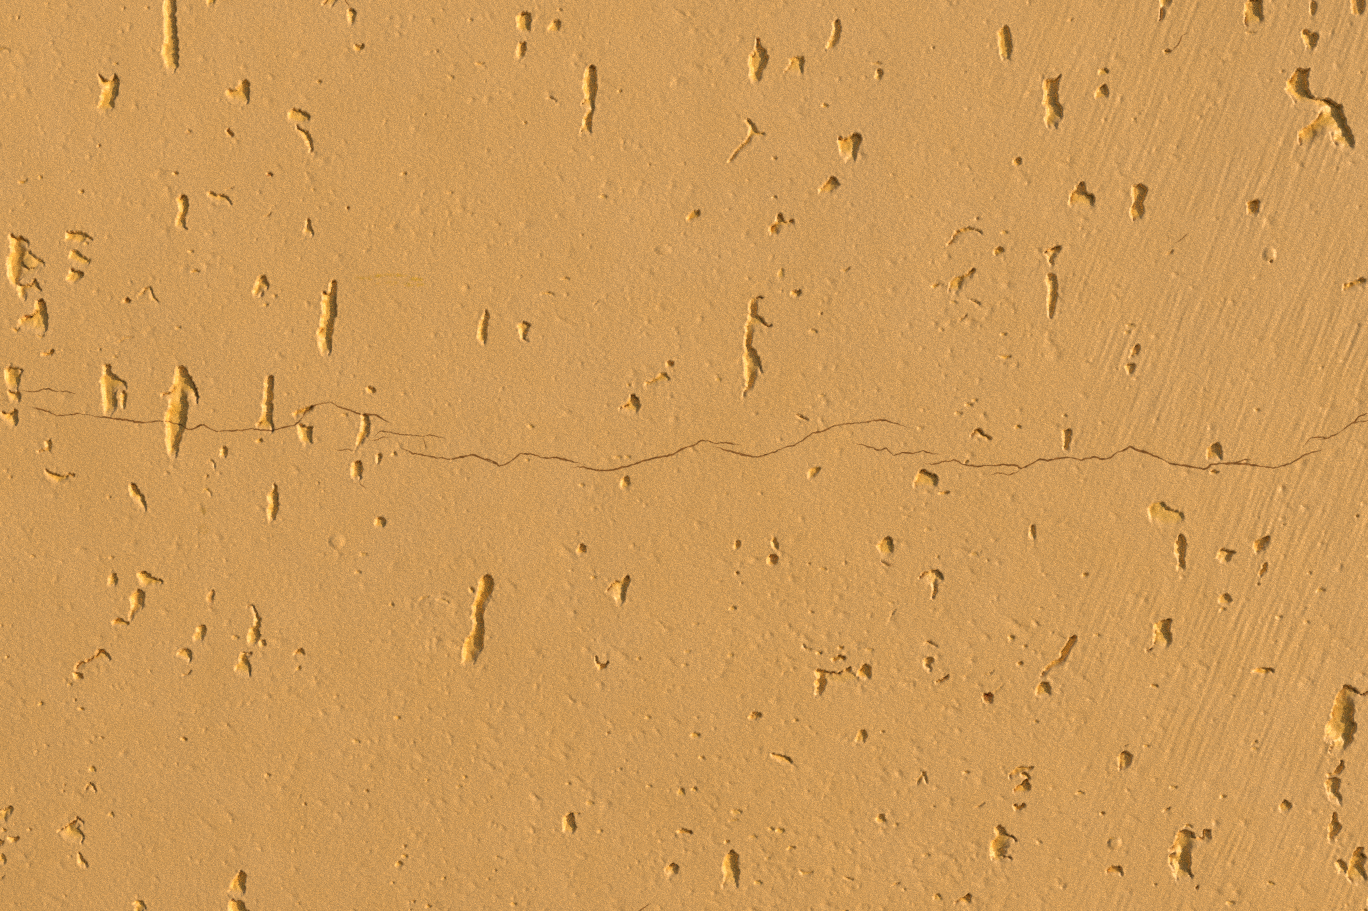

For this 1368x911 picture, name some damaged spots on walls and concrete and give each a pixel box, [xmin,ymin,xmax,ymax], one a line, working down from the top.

spalling [159,0,181,78]
spalling [577,63,600,140]
spalling [1154,0,1177,24]
hole [1282,0,1357,155]
spalling [4,231,56,360]
spalling [313,277,339,359]
hole [738,294,775,402]
hole [157,363,200,462]
crack [0,377,1368,476]
hole [460,572,496,670]
spalling [1322,682,1368,908]